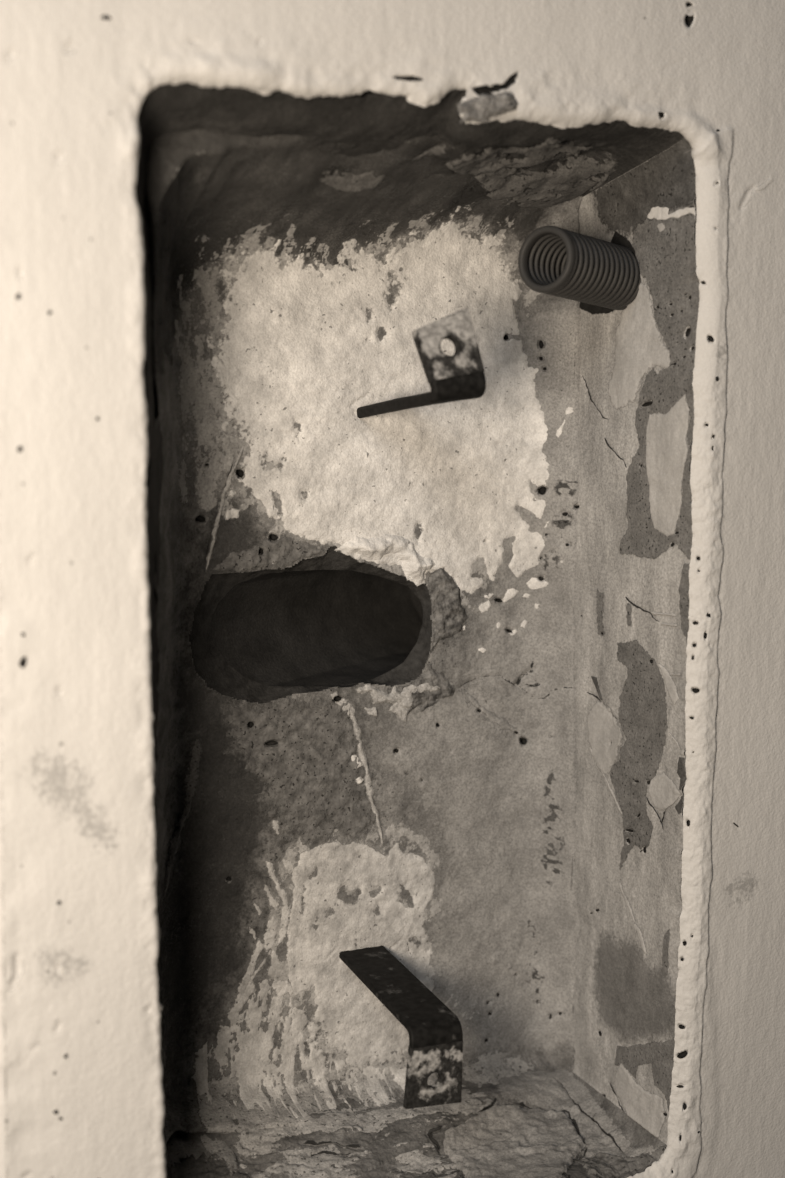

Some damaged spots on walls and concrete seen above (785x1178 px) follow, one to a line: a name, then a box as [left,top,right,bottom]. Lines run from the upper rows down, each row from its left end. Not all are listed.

spalling [473,72,518,95]
peeling [608,149,700,643]
peeling [556,407,574,437]
peeling [226,508,239,520]
spalling [213,536,326,573]
spalling [209,568,549,847]
peeling [587,640,687,870]
peeling [662,929,670,976]
crack [479,1098,532,1112]
peeling [614,1039,675,1137]
crack [427,1126,441,1150]
crack [559,1082,623,1178]